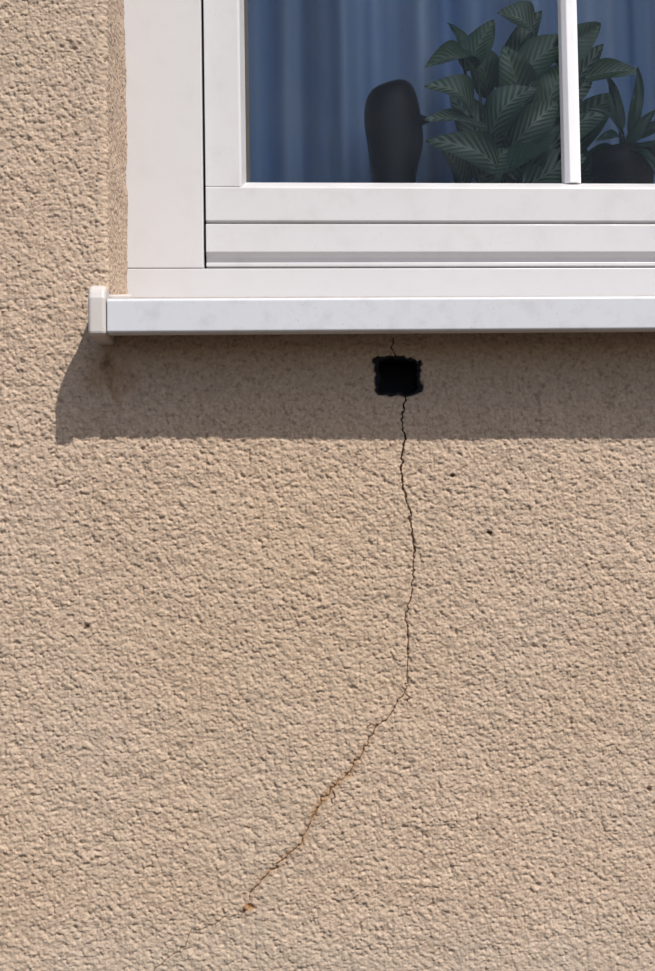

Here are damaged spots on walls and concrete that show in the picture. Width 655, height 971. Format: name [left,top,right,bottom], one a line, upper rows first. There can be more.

crack [154,394,416,971]